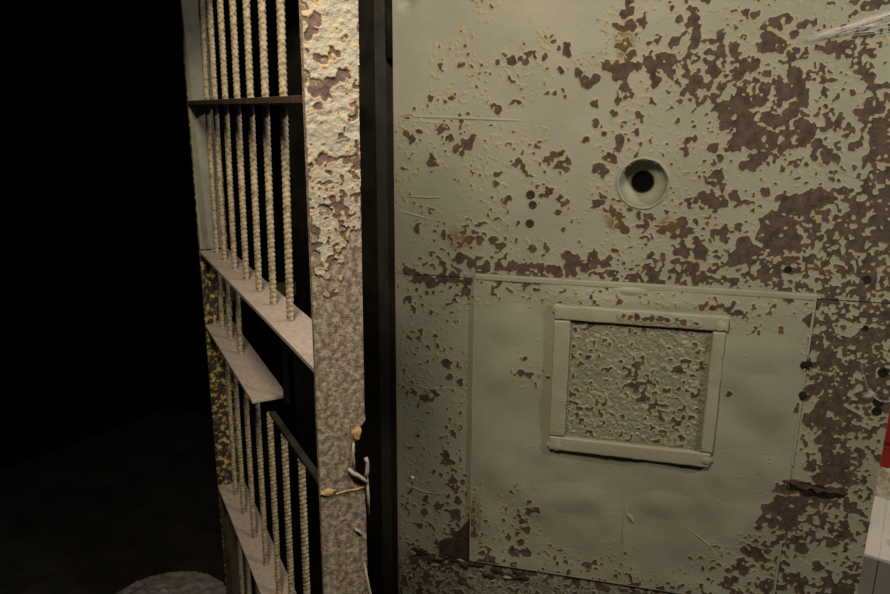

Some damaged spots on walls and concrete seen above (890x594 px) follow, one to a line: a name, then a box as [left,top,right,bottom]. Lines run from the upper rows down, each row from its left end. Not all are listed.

peeling [301,0,361,297]
peeling [395,0,890,311]
peeling [645,193,796,338]
peeling [398,344,476,484]
peeling [509,356,550,389]
peeling [567,322,708,448]
peeling [533,539,680,594]
peeling [767,466,890,594]